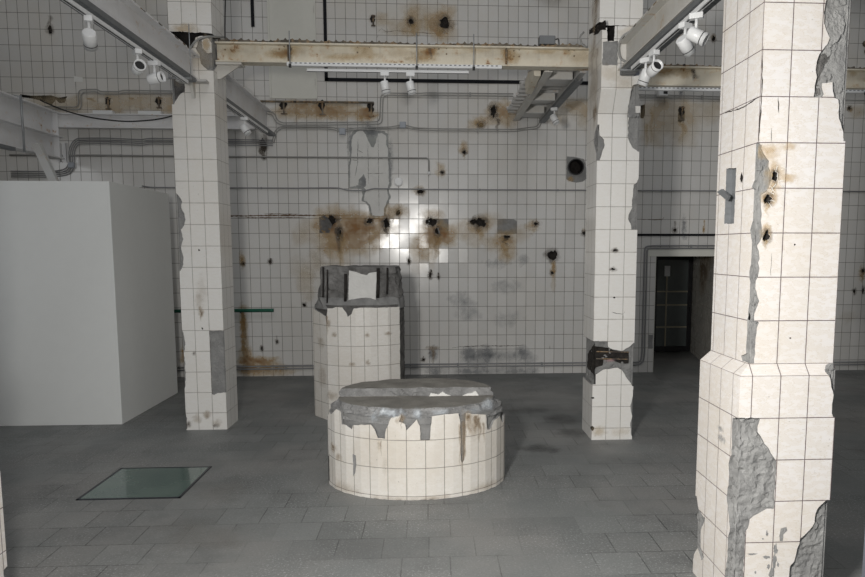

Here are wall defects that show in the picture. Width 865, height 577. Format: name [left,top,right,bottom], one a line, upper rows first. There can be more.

corrosion [419,48,437,59]
corrosion [428,12,450,36]
spalling [814,0,849,127]
spalling [627,86,639,151]
corrosion [314,209,401,253]
spalling [376,268,388,298]
corrosion [417,218,454,256]
spalling [743,147,770,363]
corrosion [239,312,283,374]
spalling [586,338,631,384]
spalling [728,417,787,577]
spalling [789,502,825,577]